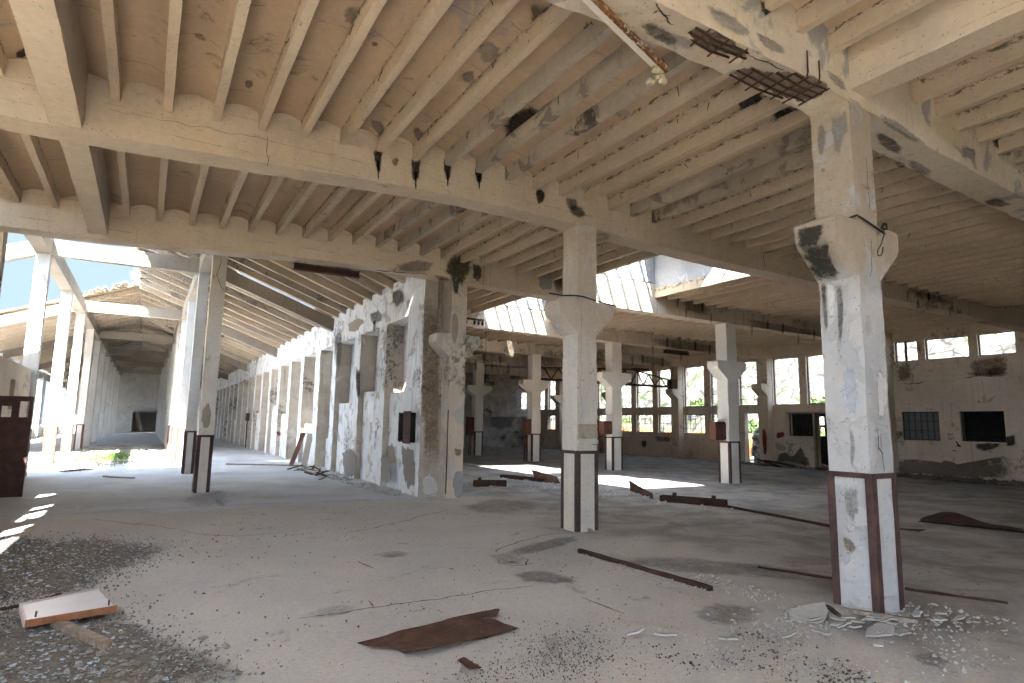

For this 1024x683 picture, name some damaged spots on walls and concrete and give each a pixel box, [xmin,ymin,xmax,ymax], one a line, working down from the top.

spalling [687,9,845,106]
peeling [349,319,364,332]
leakage [422,309,439,451]
peeling [342,449,357,476]
peeling [381,410,449,496]